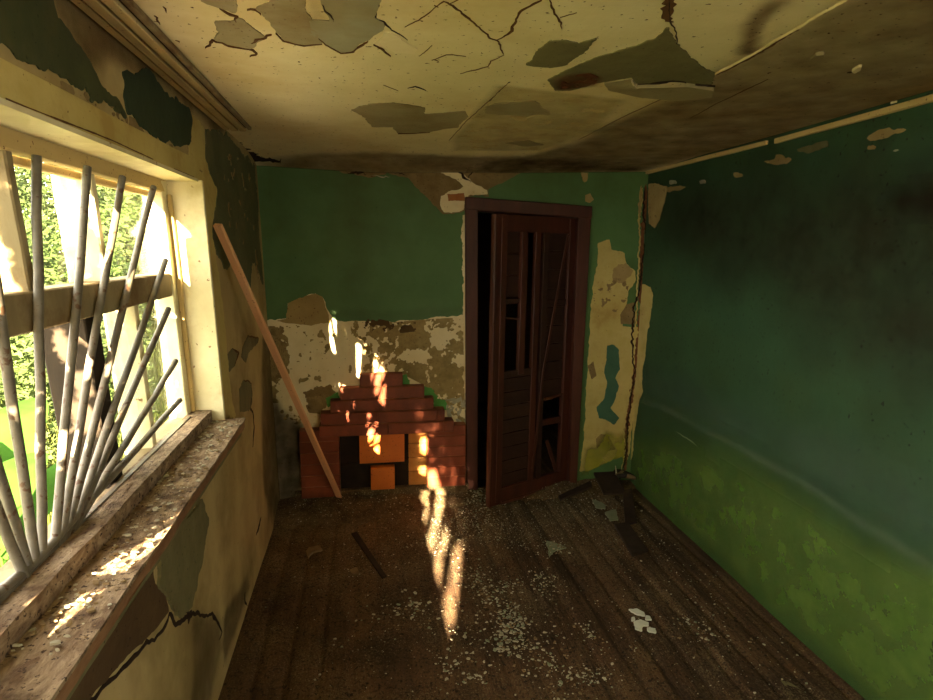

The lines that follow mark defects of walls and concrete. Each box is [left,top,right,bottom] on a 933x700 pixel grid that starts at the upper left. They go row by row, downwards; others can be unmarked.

peeling [201,0,417,57]
crack [375,0,577,74]
peeling [526,27,715,101]
peeling [351,102,468,134]
peeling [867,127,906,150]
peeling [0,0,264,418]
flaking render [648,180,685,228]
peeling [267,170,520,428]
peeling [579,240,653,475]
crack [621,185,648,471]
flaking render [69,499,209,700]
crack [90,610,222,700]